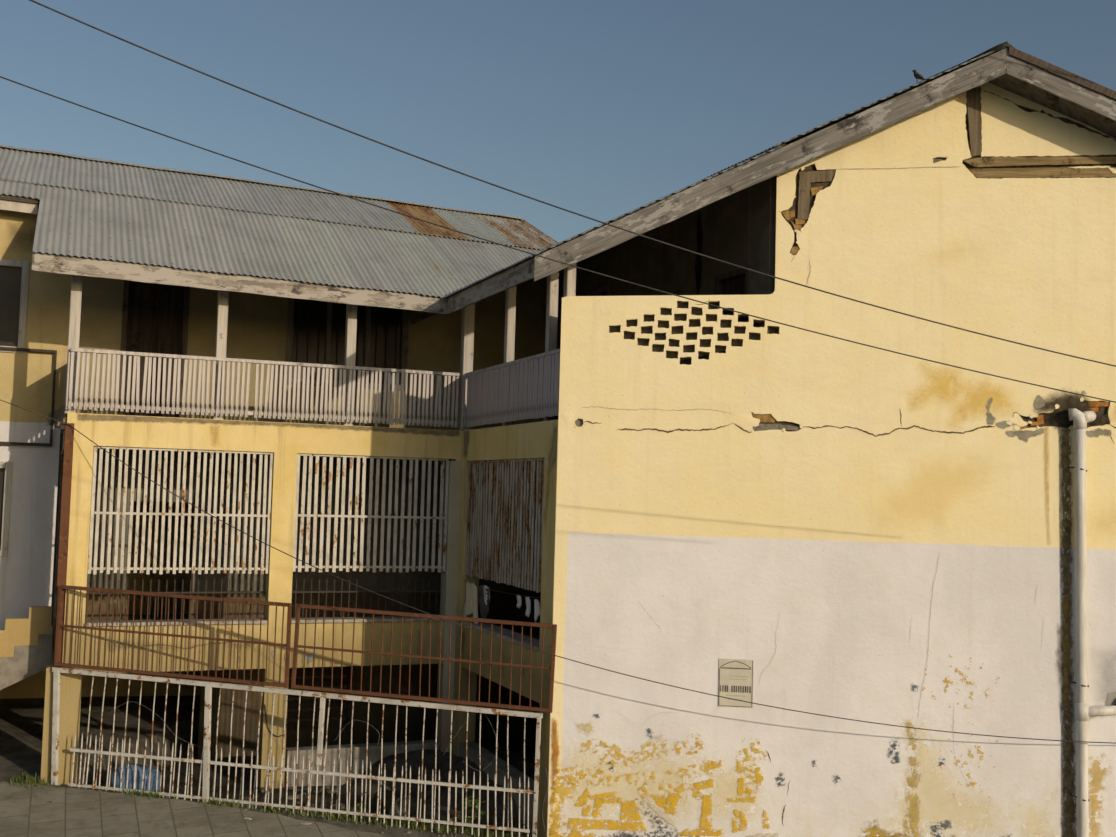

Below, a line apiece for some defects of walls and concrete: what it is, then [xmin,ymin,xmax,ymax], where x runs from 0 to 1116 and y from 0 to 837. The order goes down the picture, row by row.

spalling [779,165,836,256]
crack [580,406,751,433]
crack [807,410,995,437]
spalling [986,391,1111,442]
water stain [1037,394,1109,837]
peeling [549,724,715,837]
peeling [736,741,767,795]
water stain [865,723,954,837]